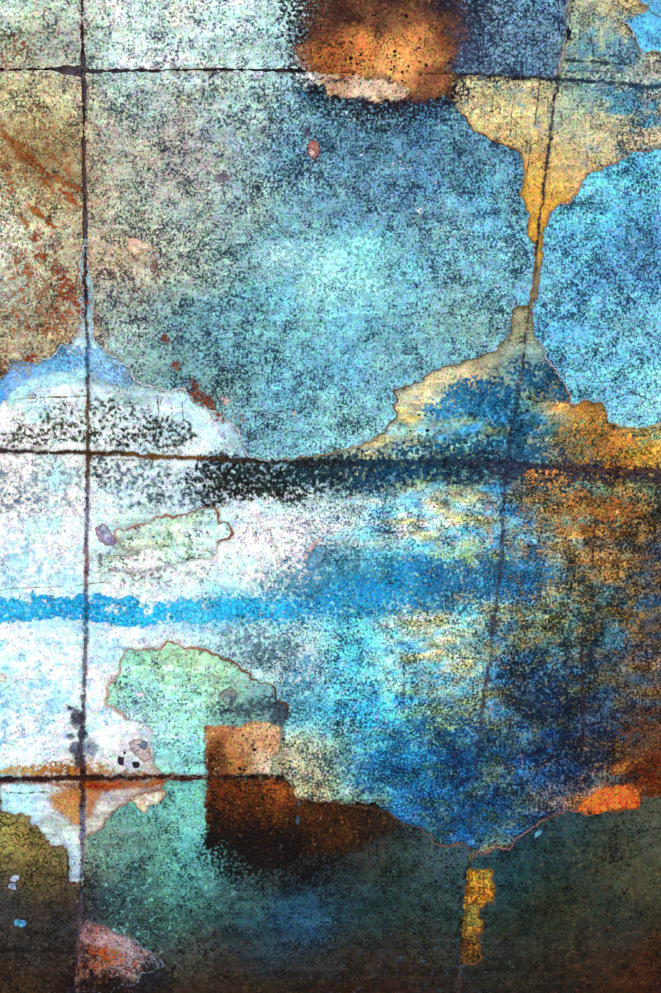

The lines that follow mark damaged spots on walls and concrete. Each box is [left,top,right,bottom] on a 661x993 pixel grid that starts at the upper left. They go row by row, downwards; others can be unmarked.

rust [272,0,550,134]
crack [510,79,540,172]
crack [564,59,627,73]
rust [0,101,102,363]
peeling [231,0,661,486]
crack [21,393,86,401]
peeling [0,238,661,862]
crack [0,791,70,924]
peeling [0,779,166,886]
rust [195,721,402,896]
peeling [460,865,496,965]
rust [576,696,661,814]